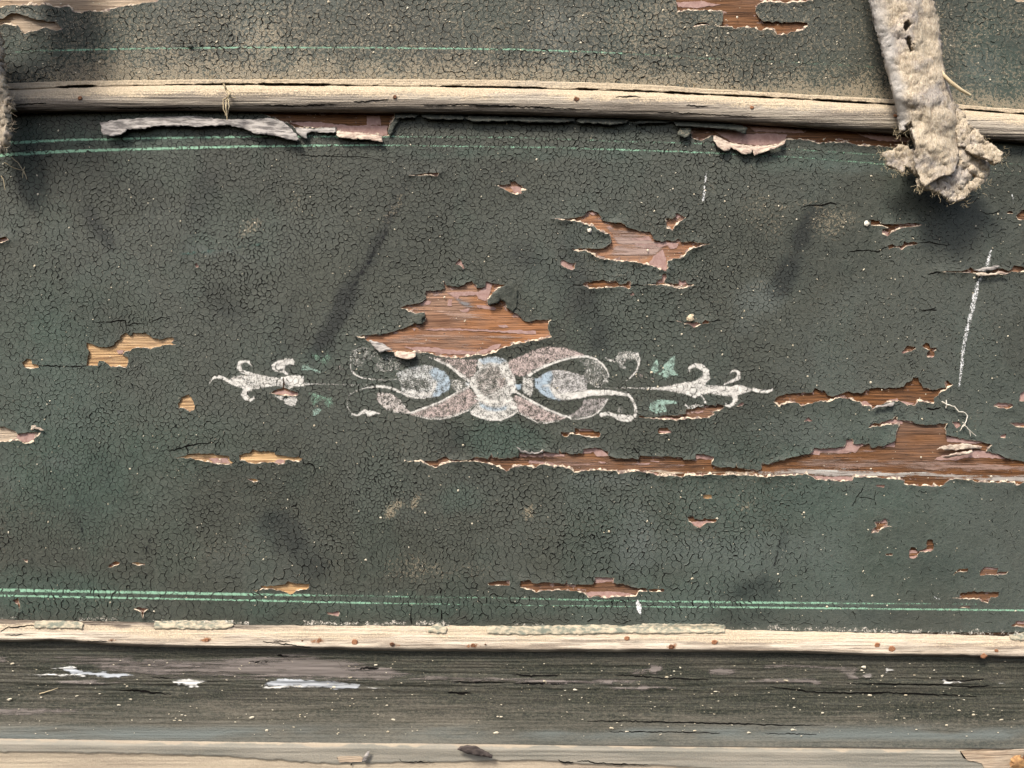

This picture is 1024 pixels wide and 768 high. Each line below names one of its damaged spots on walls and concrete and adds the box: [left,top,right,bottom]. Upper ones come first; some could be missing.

crack [0,0,889,98]
peeling [675,0,813,35]
crack [938,0,1024,114]
peeling [100,112,912,156]
peeling [556,210,708,289]
peeling [86,332,175,368]
peeling [357,281,552,359]
crack [0,103,1024,636]
peeling [0,425,44,444]
peeling [178,449,302,465]
peeling [404,377,1024,488]
peeling [487,577,665,598]